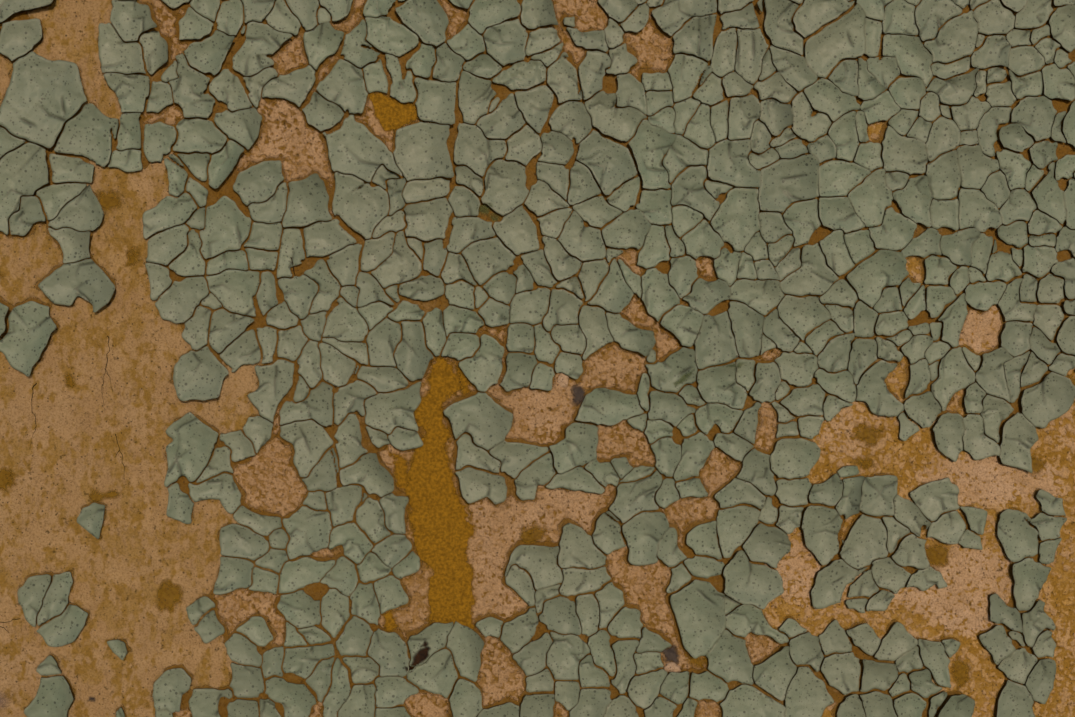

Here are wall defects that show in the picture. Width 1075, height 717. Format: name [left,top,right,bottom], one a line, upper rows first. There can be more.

peeling [0,0,454,717]
peeling [259,0,1075,717]